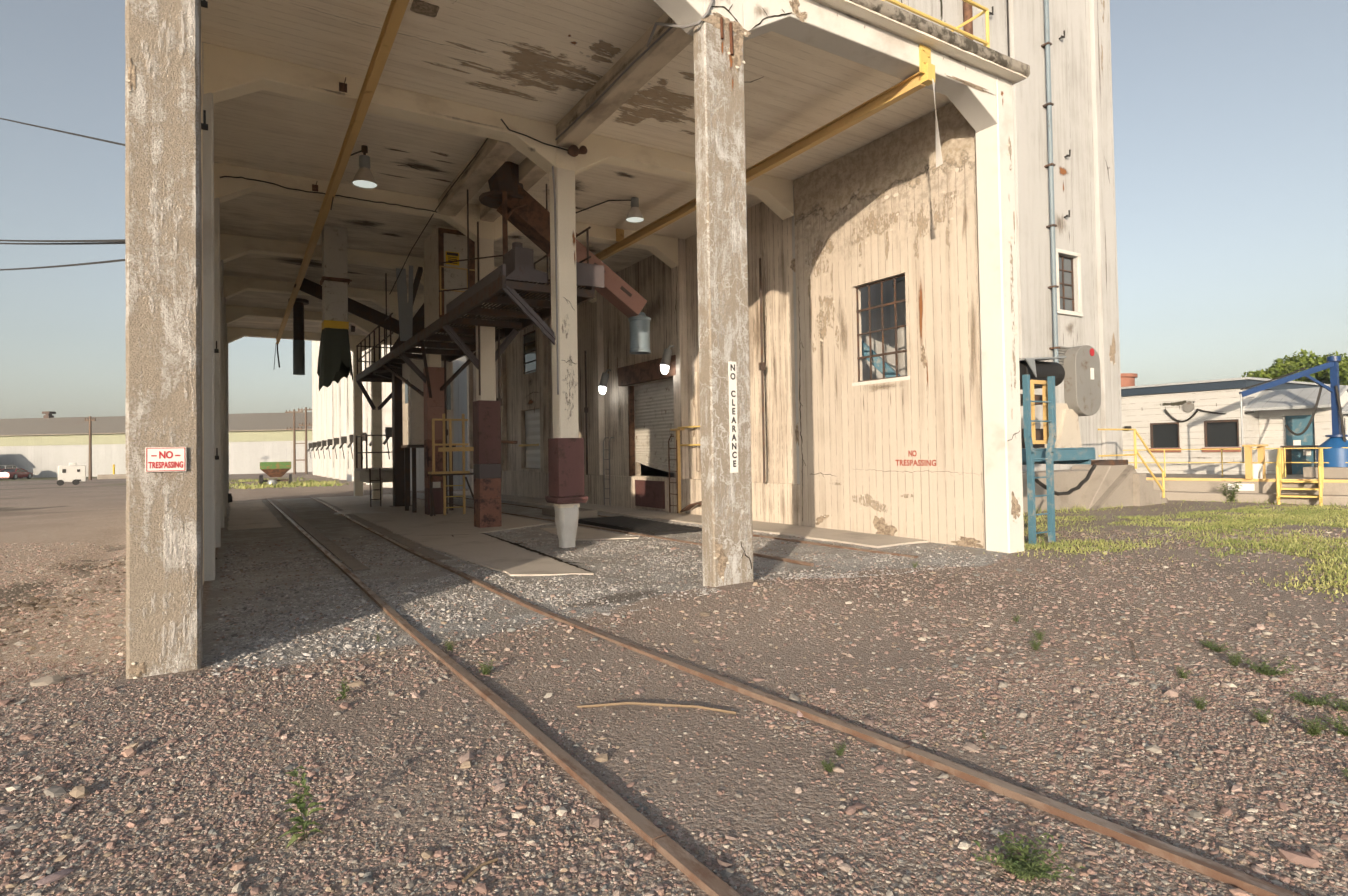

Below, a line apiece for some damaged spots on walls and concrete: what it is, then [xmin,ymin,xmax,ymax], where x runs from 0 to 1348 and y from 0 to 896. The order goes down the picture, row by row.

peeling [425,39,621,101]
peeling [616,72,720,148]
spalling [853,494,897,536]